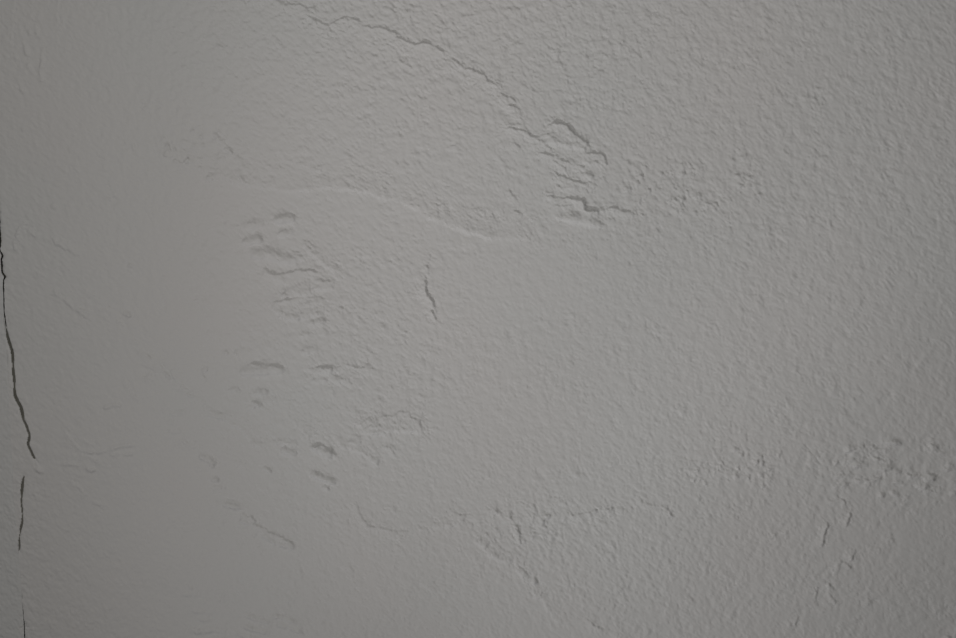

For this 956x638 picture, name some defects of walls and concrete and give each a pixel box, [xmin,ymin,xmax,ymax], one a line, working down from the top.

crack [0,222,44,556]